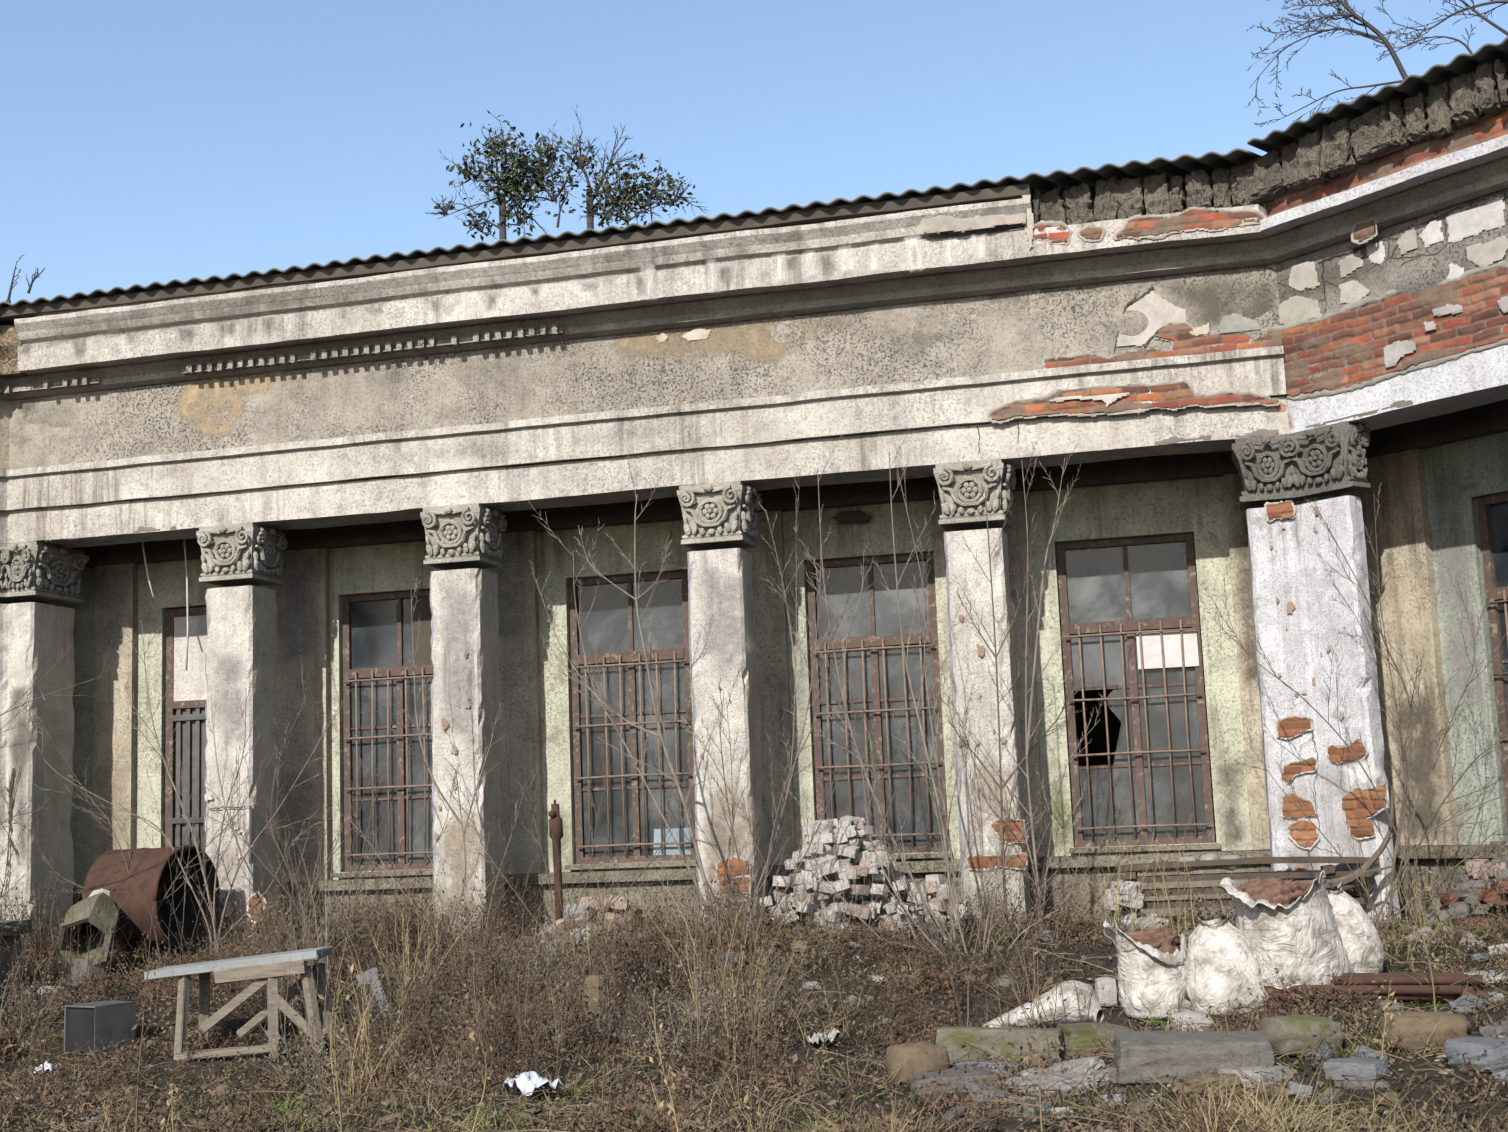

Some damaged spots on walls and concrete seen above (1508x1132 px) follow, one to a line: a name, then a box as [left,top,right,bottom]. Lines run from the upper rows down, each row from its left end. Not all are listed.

spalling [916,107,1508,249]
spalling [987,197,1508,445]
spalling [1264,500,1295,522]
spalling [1275,676,1316,740]
peeling [710,786,752,909]
spalling [1281,738,1368,871]
spalling [1341,783,1389,840]